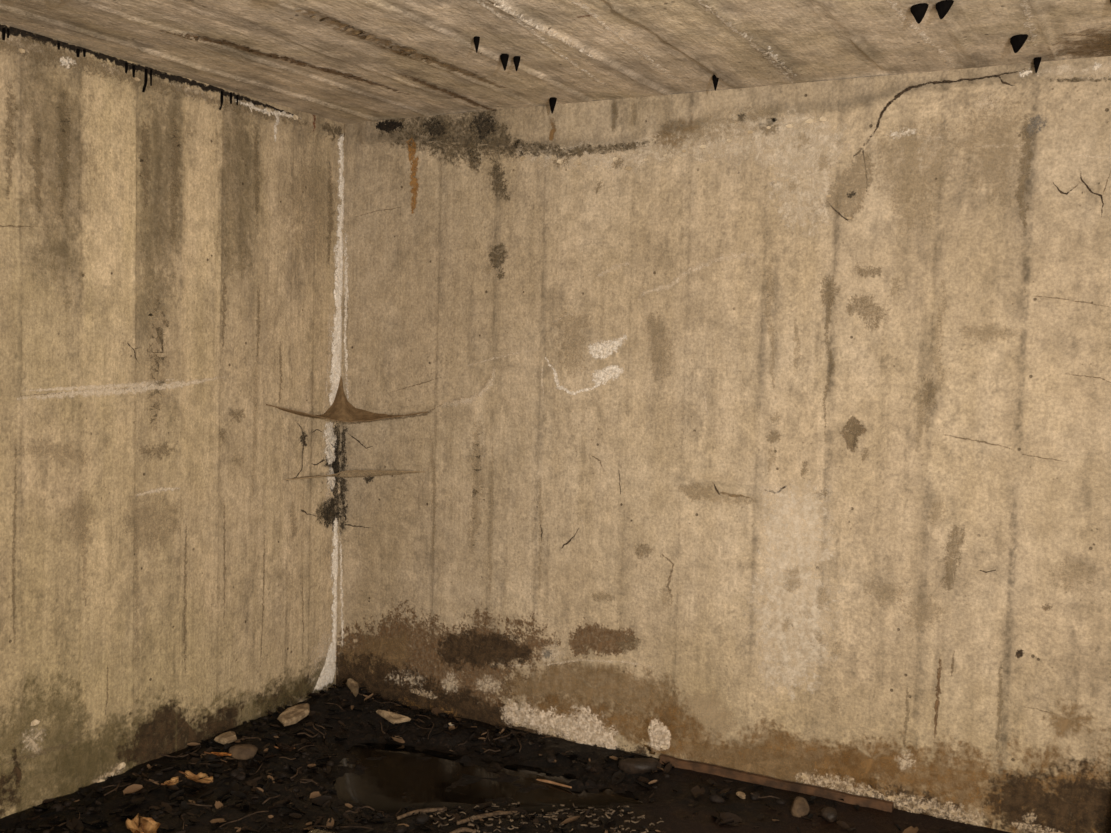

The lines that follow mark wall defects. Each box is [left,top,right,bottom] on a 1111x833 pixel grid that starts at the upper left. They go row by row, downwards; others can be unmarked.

water stain [296,10,505,88]
water stain [235,101,301,224]
corrosion [408,138,419,214]
water stain [167,32,697,200]
crack [853,68,1026,192]
water stain [820,279,839,435]
water stain [0,422,1111,833]